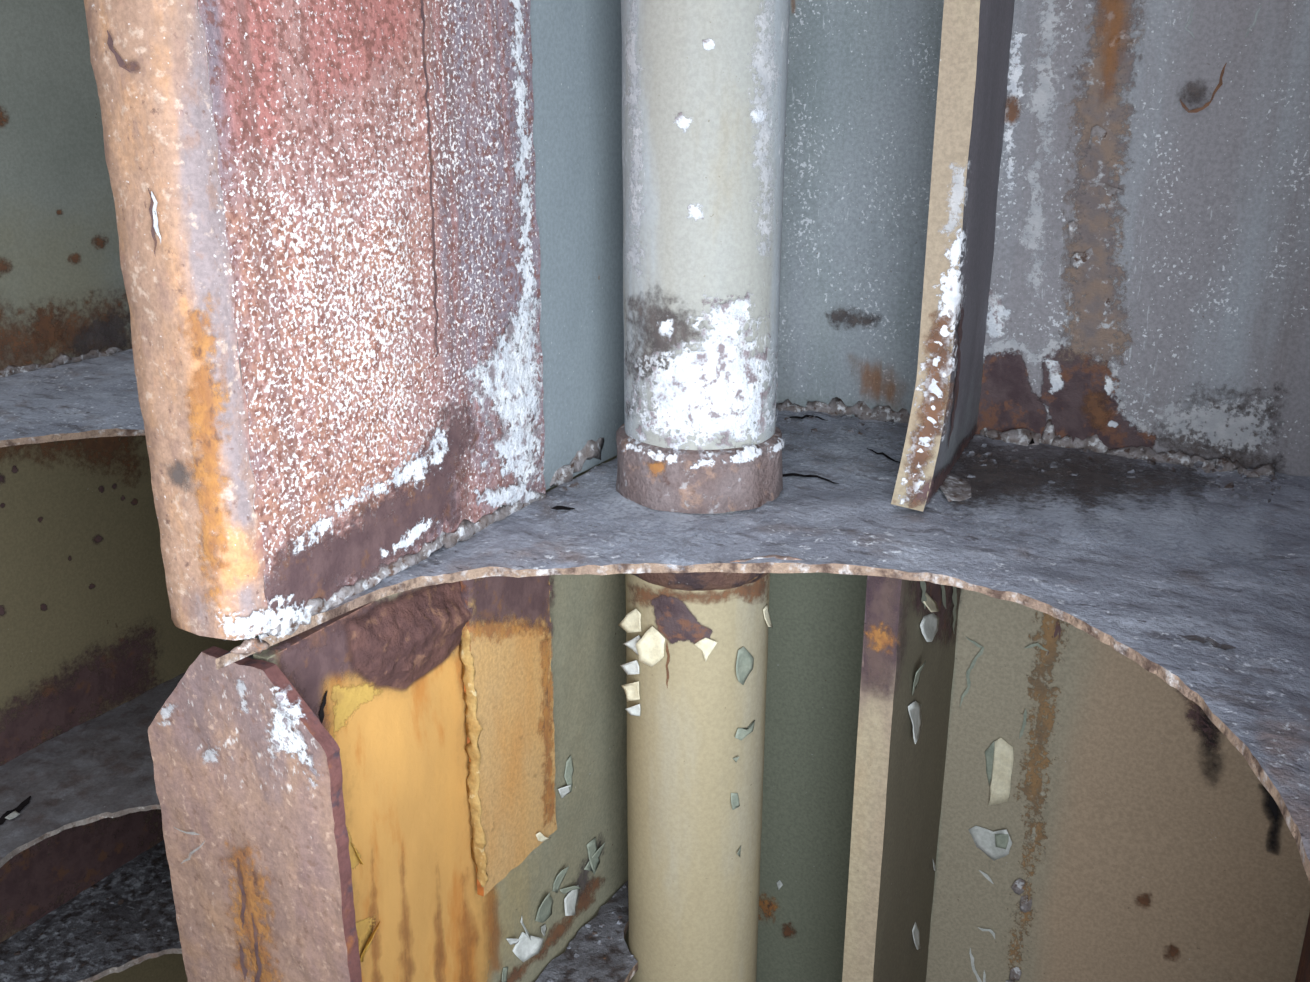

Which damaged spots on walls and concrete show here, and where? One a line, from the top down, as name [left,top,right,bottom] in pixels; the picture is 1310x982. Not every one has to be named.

efflorescence [624,0,644,275]
efflorescence [465,0,545,508]
corrosion [179,309,228,601]
corrosion [263,405,477,621]
efflorescence [557,463,738,567]
efflorescence [625,293,905,515]
corrosion [907,286,978,508]
corrosion [269,575,605,982]
peeling [502,837,605,982]
peeling [619,595,717,716]
peeling [969,826,1012,884]
peeling [985,709,1027,806]